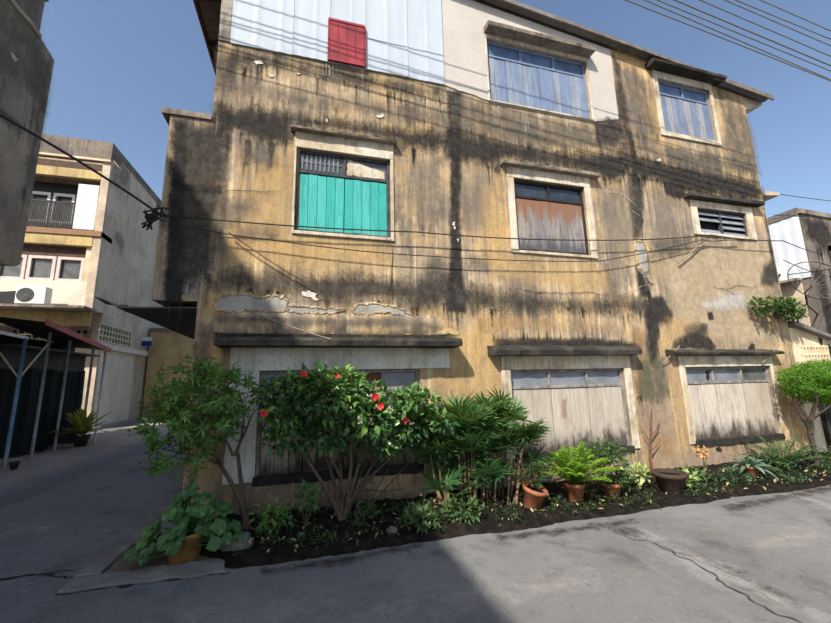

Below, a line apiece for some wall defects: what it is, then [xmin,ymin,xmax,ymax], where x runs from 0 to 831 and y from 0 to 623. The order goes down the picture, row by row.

leakage [164,44,765,446]
leakage [761,212,778,285]
peeling [212,291,416,317]
crack [0,570,76,580]
crack [55,584,134,595]
crack [615,528,802,623]